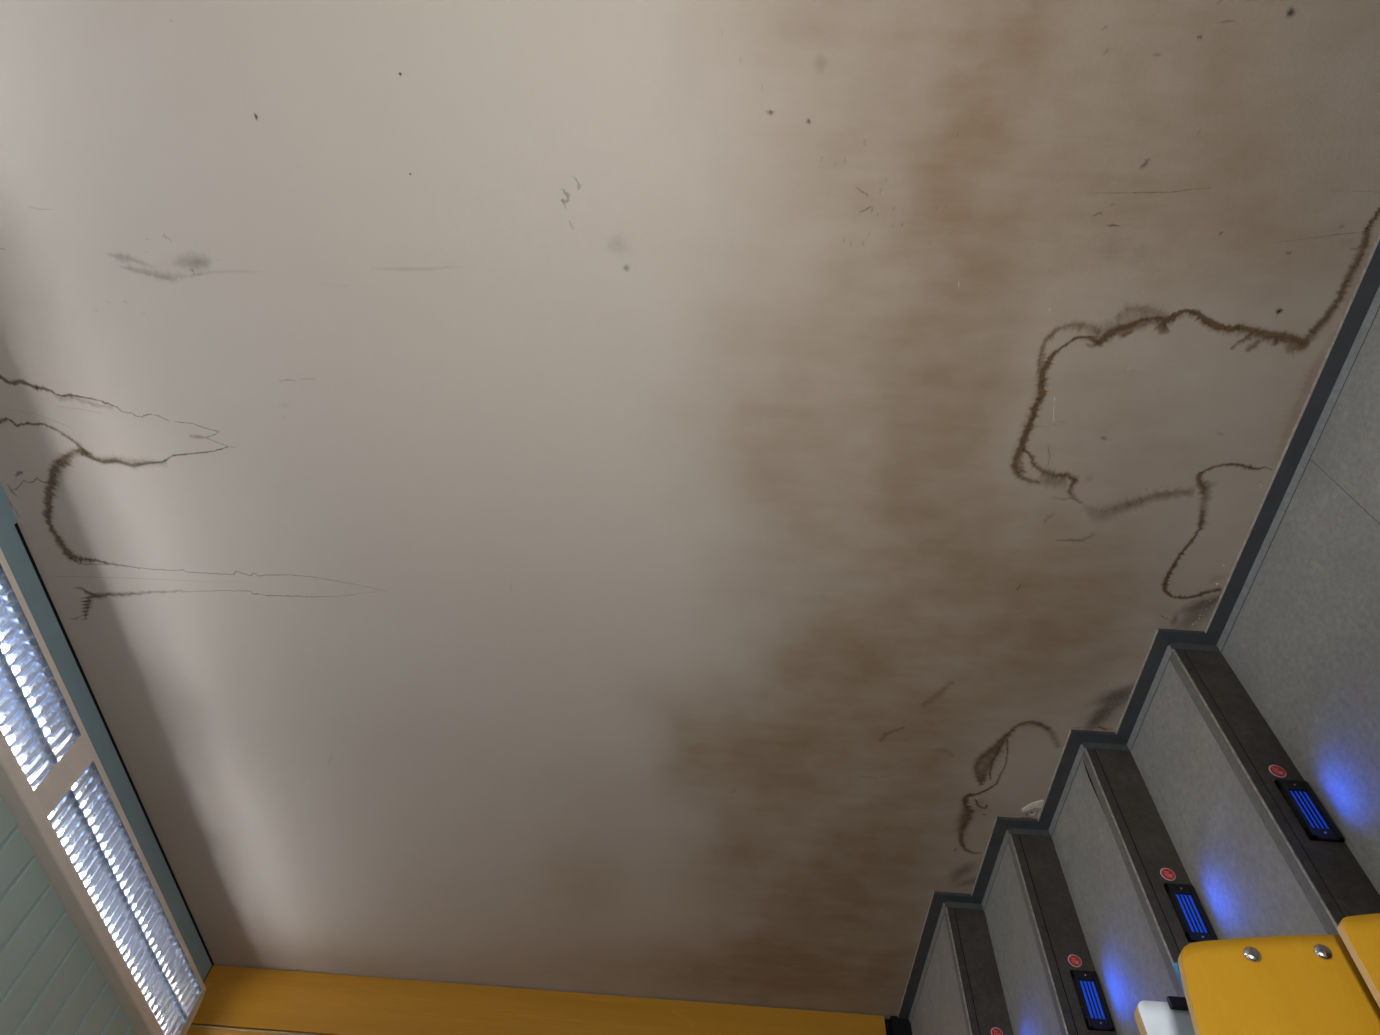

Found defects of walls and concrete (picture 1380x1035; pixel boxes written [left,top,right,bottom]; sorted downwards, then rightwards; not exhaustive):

water stain [1012,208,1380,494]
water stain [1162,463,1264,599]
water stain [954,722,1048,854]
crack [1083,760,1105,814]